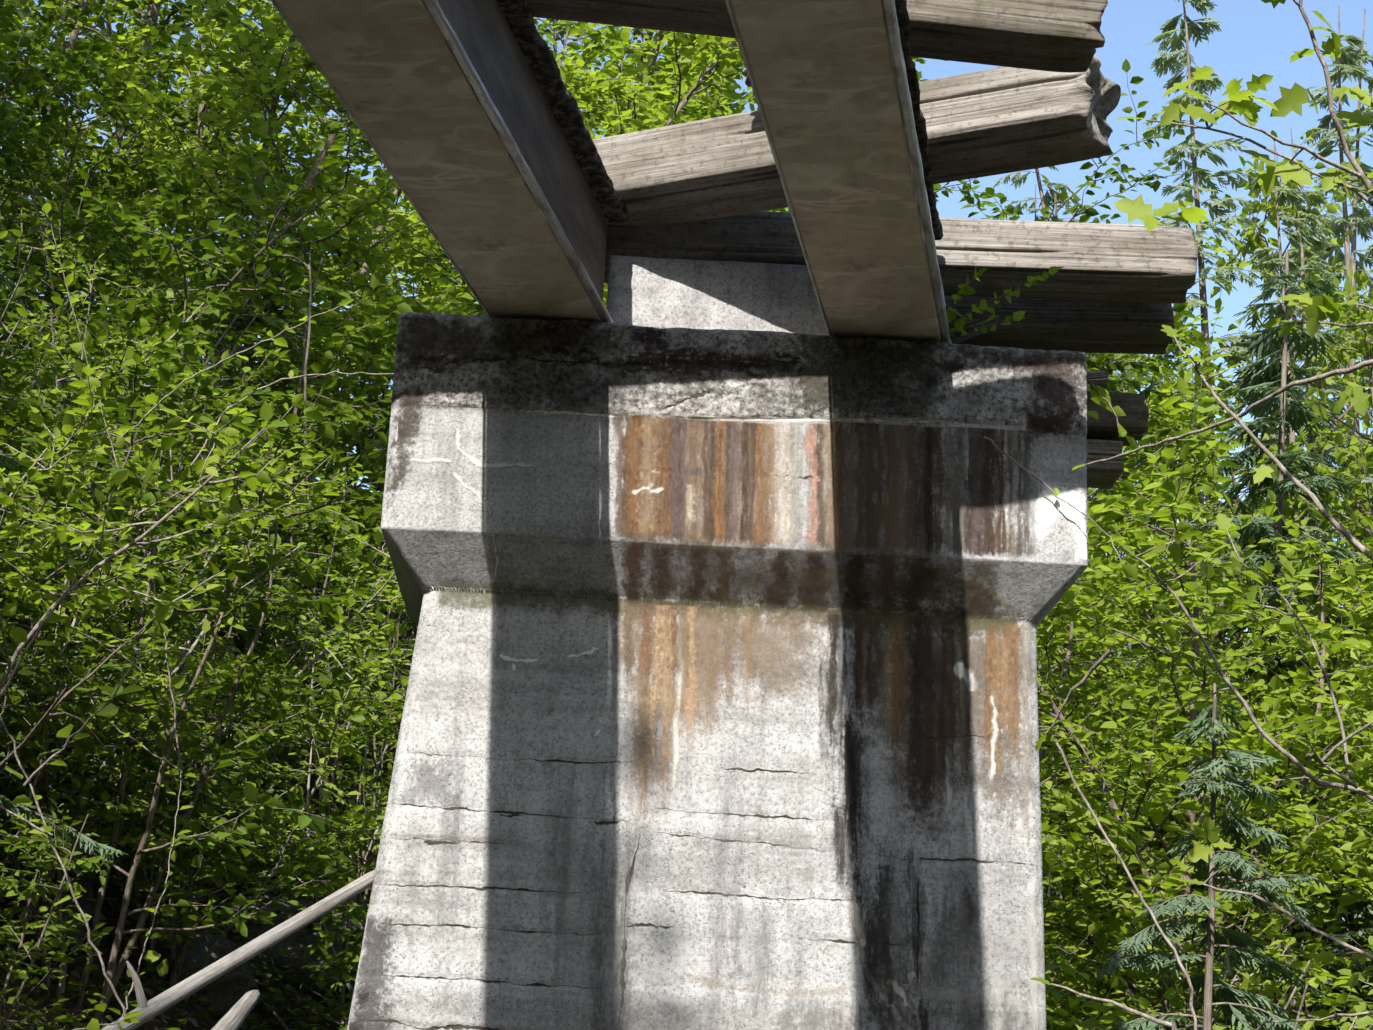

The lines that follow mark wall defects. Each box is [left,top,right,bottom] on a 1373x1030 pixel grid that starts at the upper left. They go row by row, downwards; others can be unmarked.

damp [671,664,683,796]
rust [614,415,1026,831]
damp [828,611,861,837]
damp [953,662,974,691]
damp [990,697,999,777]
crack [360,803,1031,1030]
damp [1027,893,1040,1030]